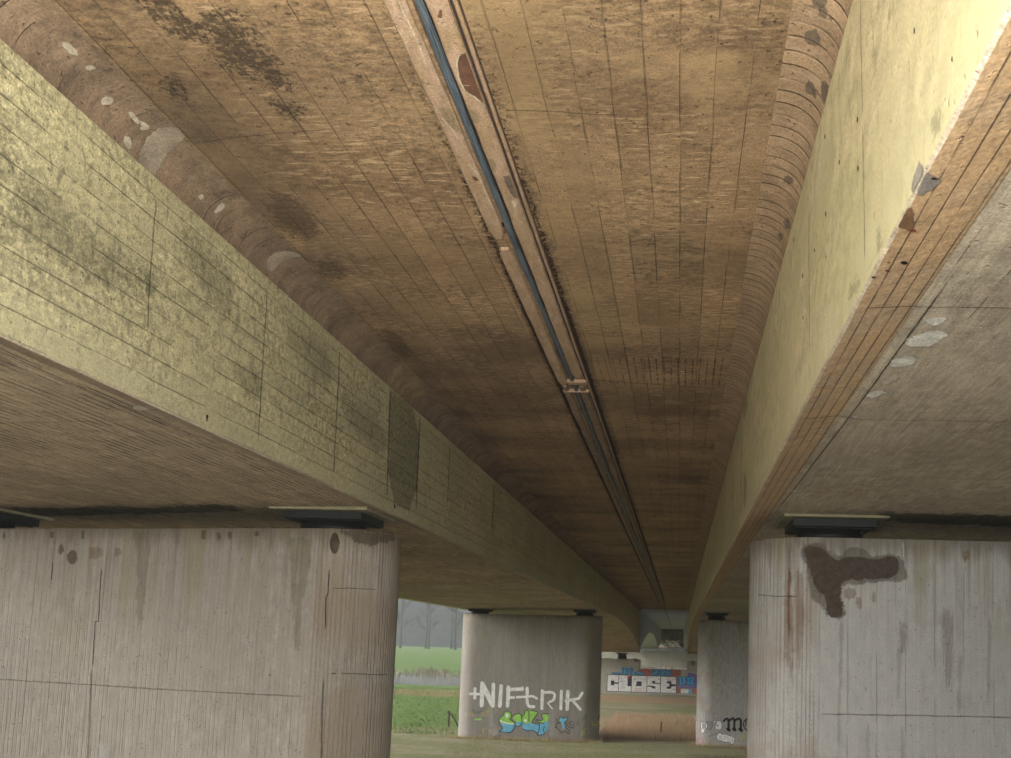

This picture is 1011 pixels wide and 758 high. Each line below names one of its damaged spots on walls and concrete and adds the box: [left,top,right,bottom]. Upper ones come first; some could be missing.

damp [813,0,827,19]
damp [804,29,820,46]
peeling [62,42,78,56]
damp [136,0,305,120]
peeling [455,53,483,106]
damp [805,81,828,103]
peeling [128,112,150,130]
spalling [917,173,941,195]